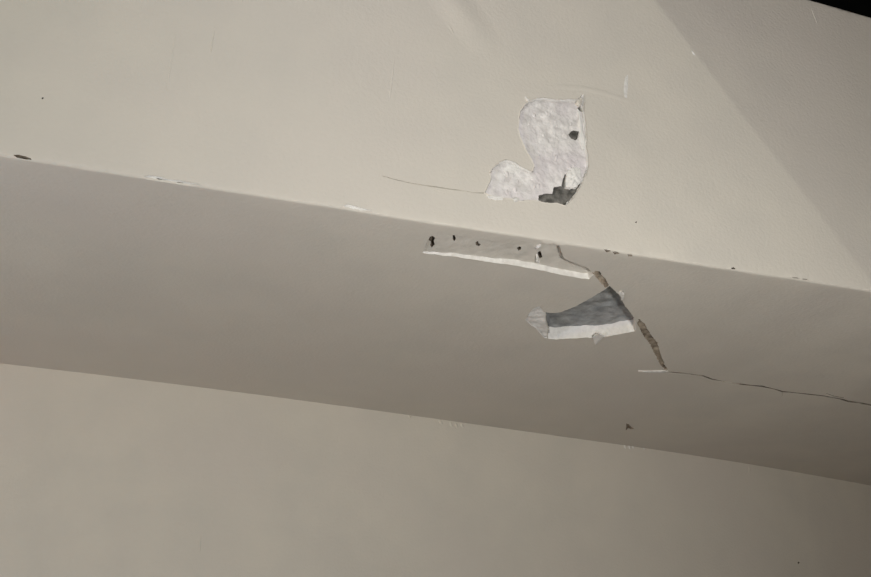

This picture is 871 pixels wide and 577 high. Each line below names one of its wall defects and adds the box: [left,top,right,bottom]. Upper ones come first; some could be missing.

flaking render [484,94,589,207]
peeling [423,234,594,279]
crack [593,271,609,288]
flaking render [526,286,636,345]
crack [637,319,871,406]